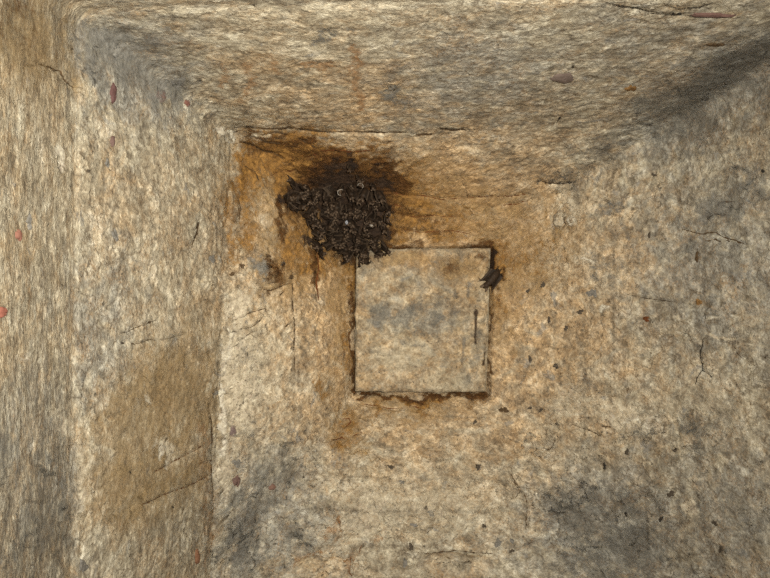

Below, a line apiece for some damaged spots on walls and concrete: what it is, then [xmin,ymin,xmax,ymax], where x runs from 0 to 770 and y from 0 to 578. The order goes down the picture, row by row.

crack [606,2,713,18]
crack [41,63,74,88]
crack [682,201,746,245]
rust [220,127,493,417]
rust [462,240,528,281]